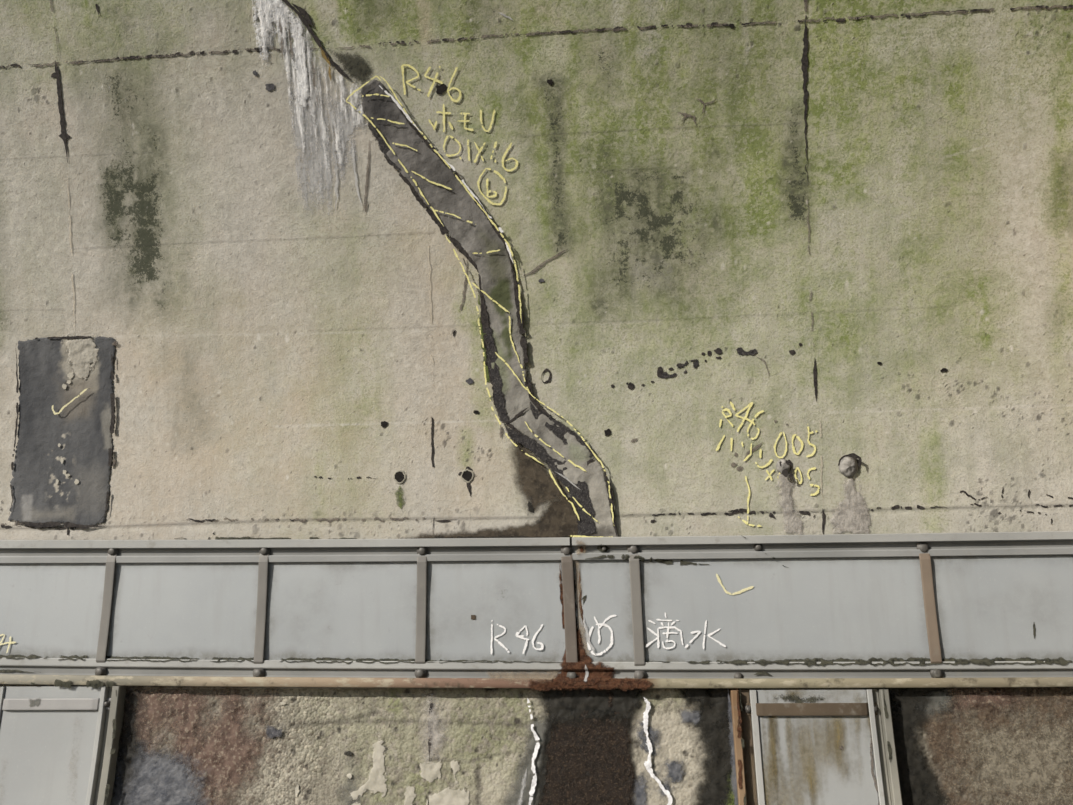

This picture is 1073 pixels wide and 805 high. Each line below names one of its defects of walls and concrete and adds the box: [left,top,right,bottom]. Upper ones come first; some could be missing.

leakage [252,0,372,212]
crack [0,0,1073,536]
crack [186,517,482,540]
corrosion [490,541,653,691]
leakage [506,688,659,805]
leakage [659,761,684,796]
leakage [681,688,744,805]